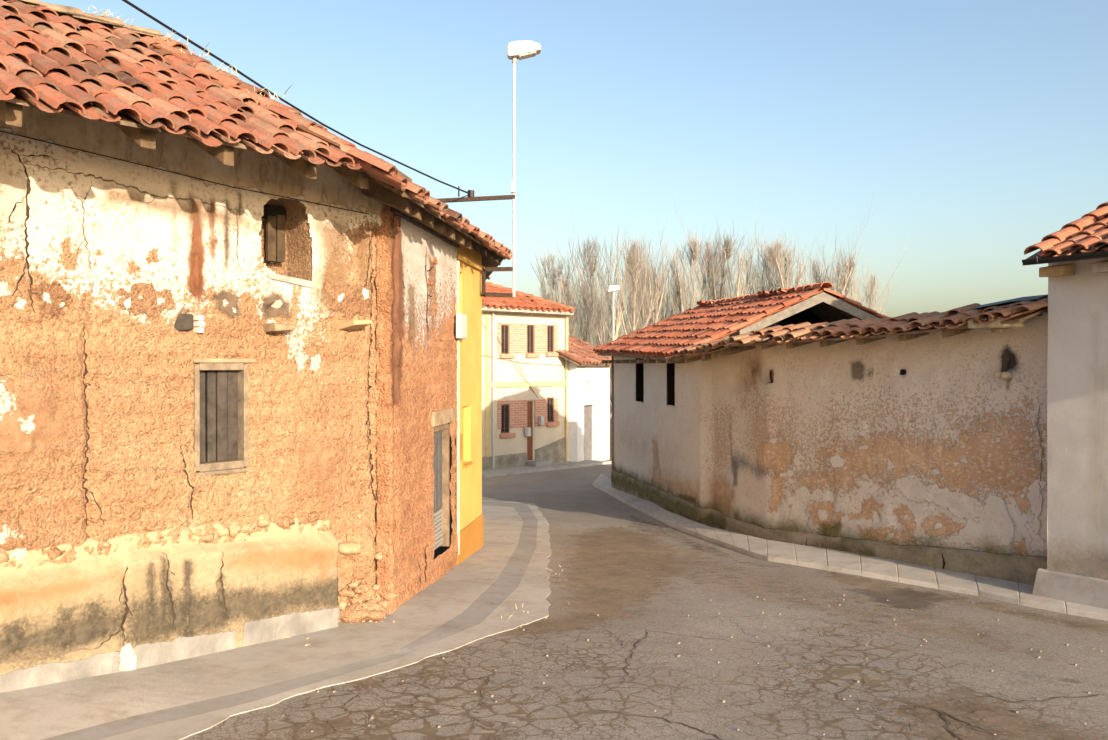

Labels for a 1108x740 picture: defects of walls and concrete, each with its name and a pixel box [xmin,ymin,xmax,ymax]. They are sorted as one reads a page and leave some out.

crack [2,144,249,312]
damp [110,191,241,266]
peeling [0,277,73,317]
peeling [117,282,175,318]
spalling [262,294,290,318]
damp [391,221,415,404]
crack [403,253,434,341]
peeling [0,378,35,434]
crack [0,328,199,538]
crack [273,230,401,569]
peeling [702,348,1047,555]
crack [0,567,133,664]